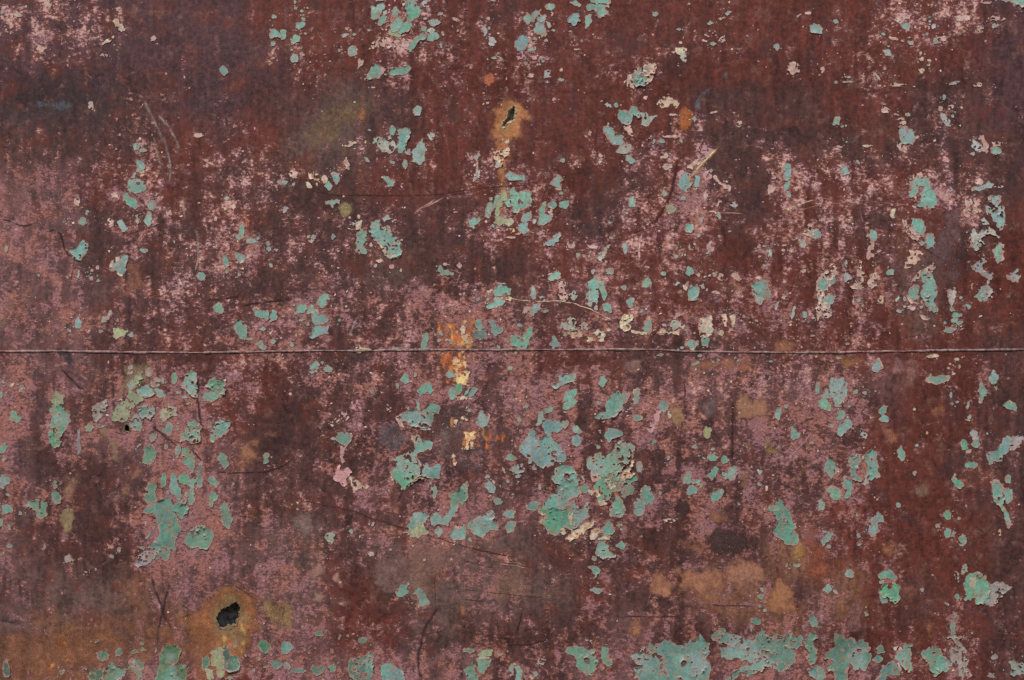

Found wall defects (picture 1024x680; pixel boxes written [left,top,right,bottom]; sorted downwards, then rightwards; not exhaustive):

peeling [338,0,460,88]
rust [484,73,494,86]
rust [492,100,530,214]
peeling [468,61,1021,366]
peeling [45,365,234,568]
rust [437,319,476,383]
peeling [386,282,672,594]
rust [736,394,767,420]
peeling [815,377,880,511]
rust [2,586,293,680]
rust [650,559,795,615]
peeling [631,564,1012,680]